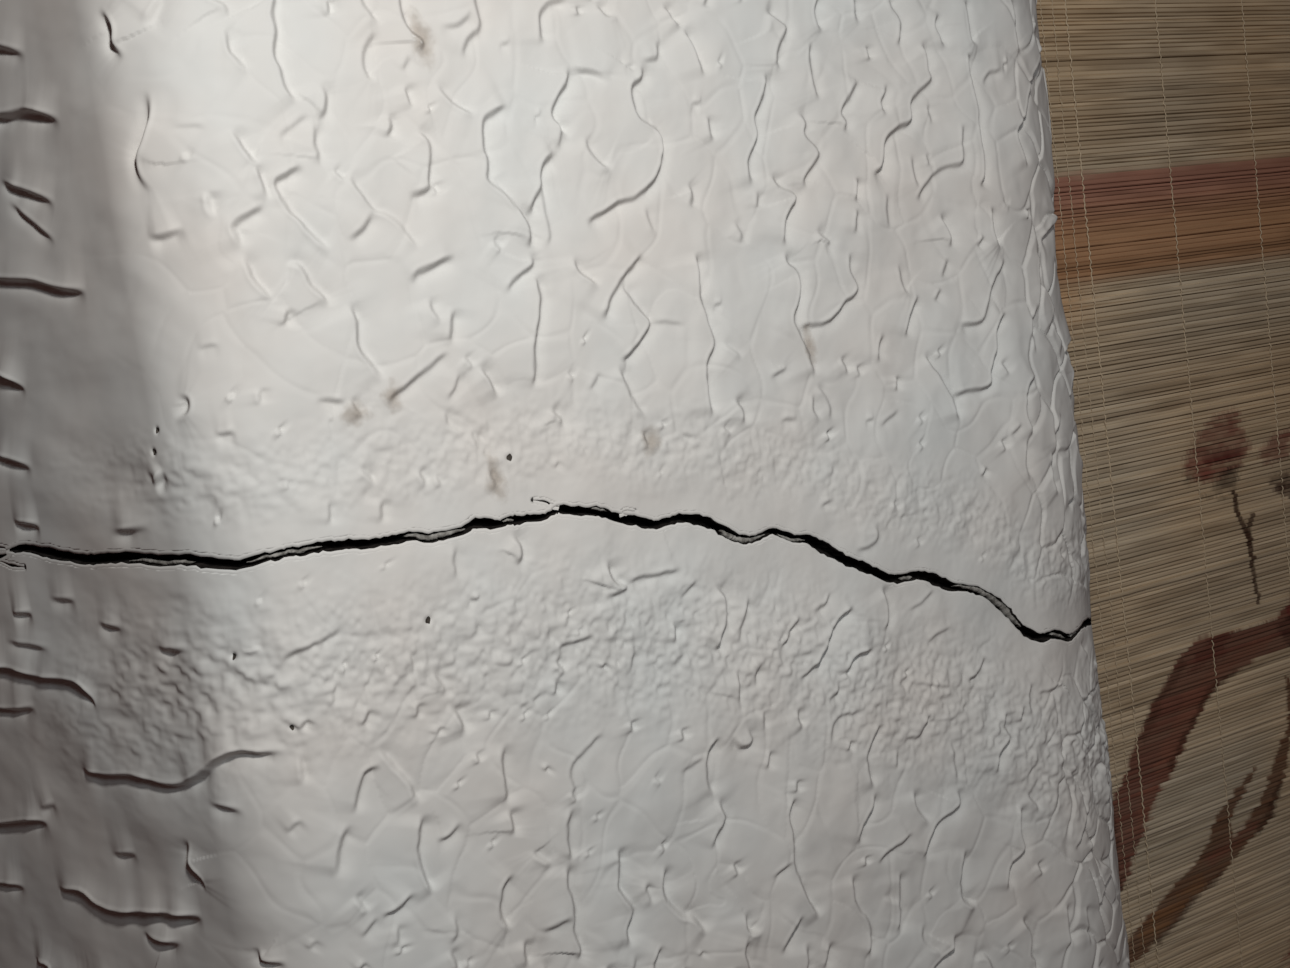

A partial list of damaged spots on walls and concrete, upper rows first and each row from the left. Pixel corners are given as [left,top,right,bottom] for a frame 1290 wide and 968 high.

crack [0,497,1092,646]